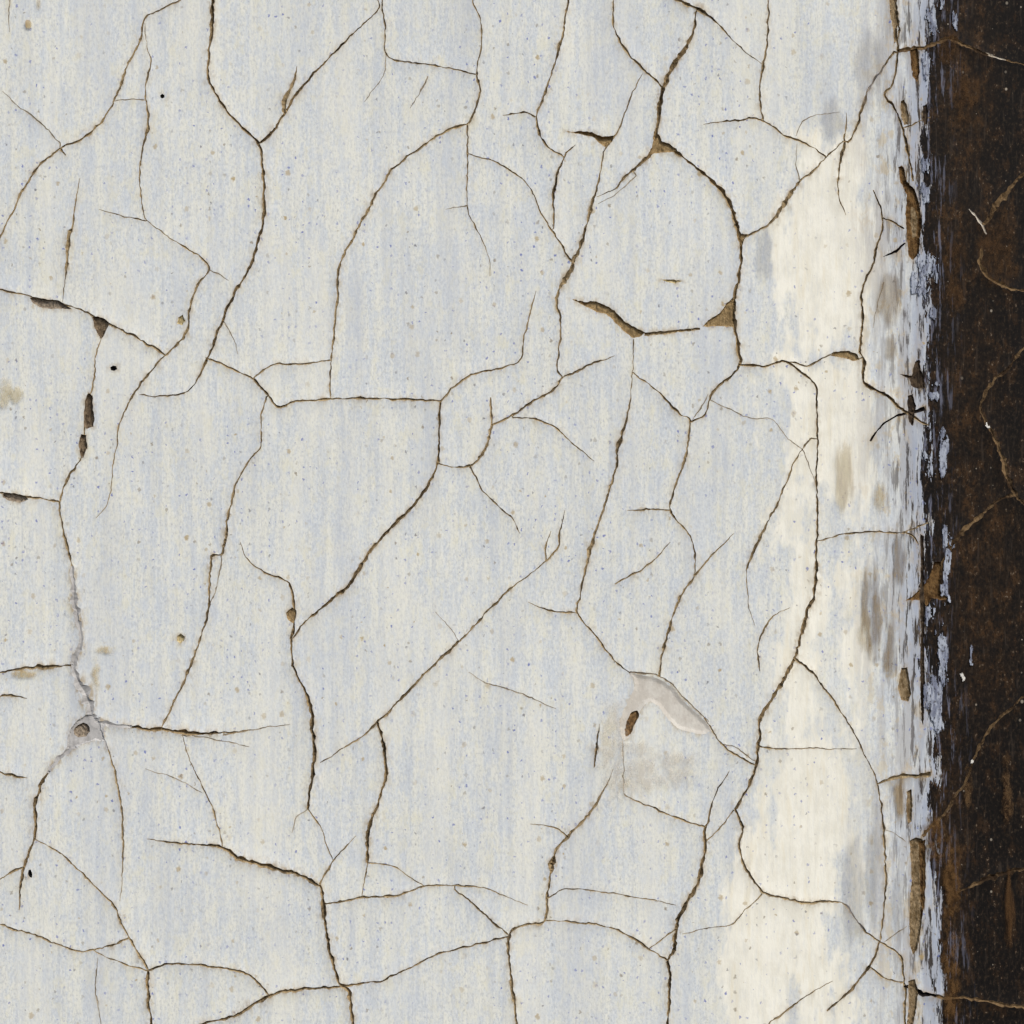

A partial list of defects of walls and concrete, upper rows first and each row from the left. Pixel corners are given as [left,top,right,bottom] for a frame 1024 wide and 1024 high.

crack [612,0,1024,237]
spalling [78,392,95,458]
crack [0,0,229,518]
crack [139,0,615,533]
spalling [572,298,734,338]
crack [858,190,929,442]
peeling [898,157,939,320]
peeling [900,360,940,426]
crack [0,243,931,1024]
peeling [898,525,973,734]
peeling [909,837,926,954]
crack [917,989,1024,1009]